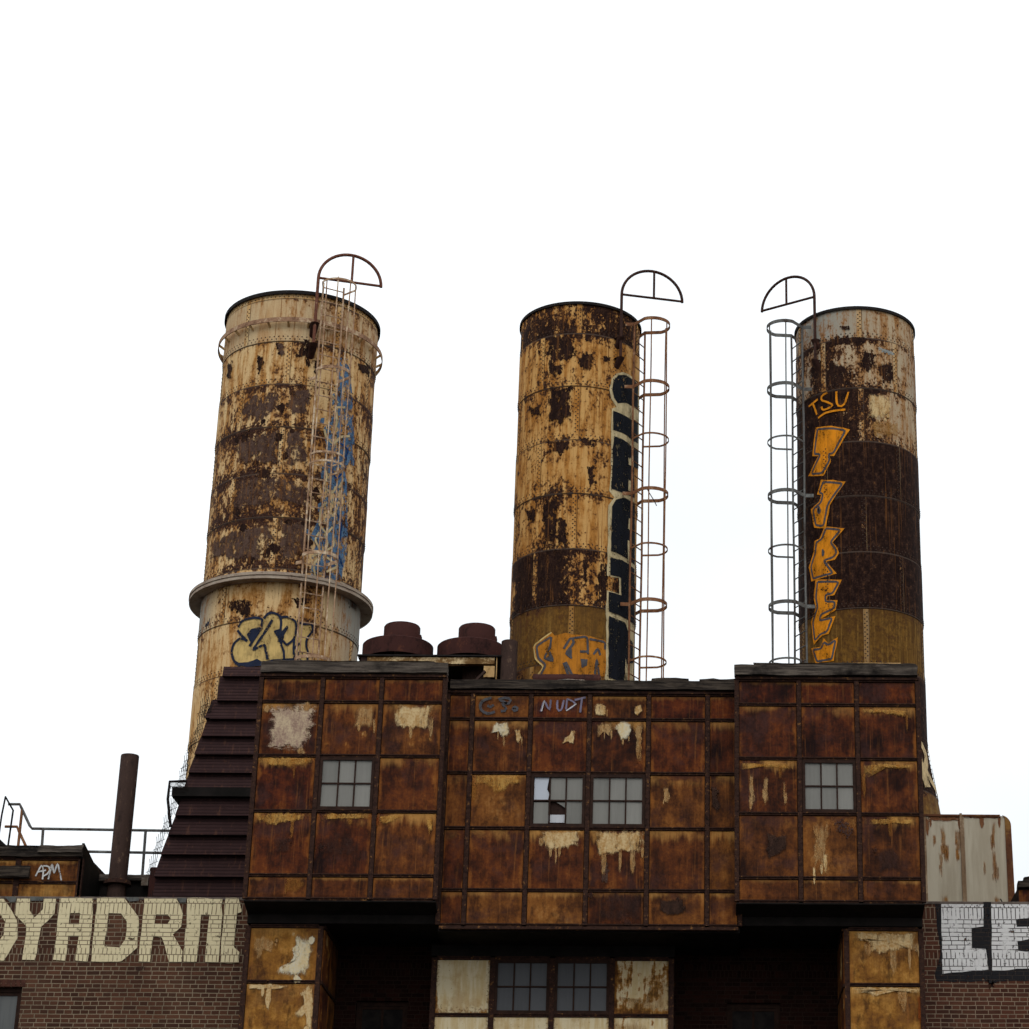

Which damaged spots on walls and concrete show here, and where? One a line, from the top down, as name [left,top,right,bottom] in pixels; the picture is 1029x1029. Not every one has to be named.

rust [529,334,610,425]
rust [806,325,894,390]
rust [210,384,322,564]
rust [547,438,598,456]
rust [515,496,619,615]
peeling [264,702,316,754]
peeling [395,706,433,737]
peeling [595,704,642,756]
peeling [539,831,579,863]
peeling [597,831,644,873]
rust [926,816,1001,879]
peeling [249,936,315,1029]